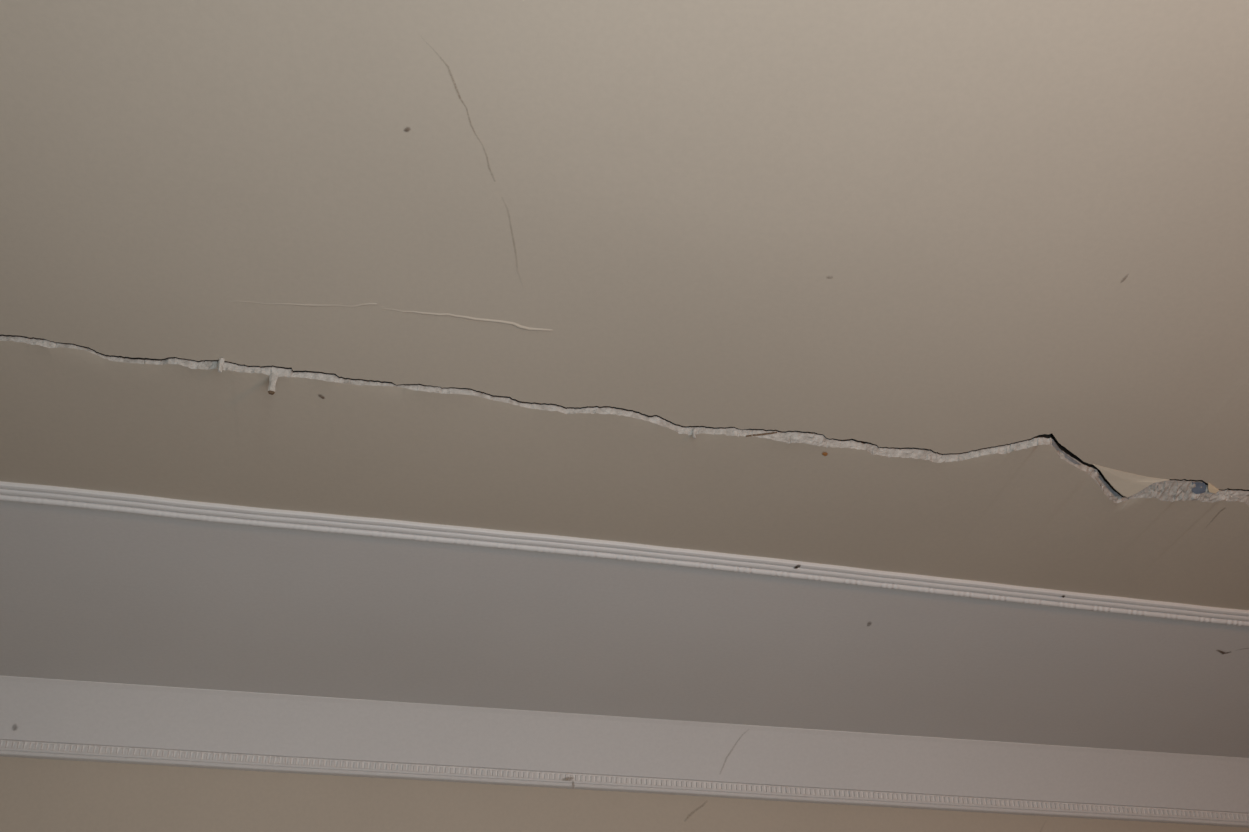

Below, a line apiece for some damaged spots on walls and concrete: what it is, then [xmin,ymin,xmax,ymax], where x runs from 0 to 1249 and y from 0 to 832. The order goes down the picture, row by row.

crack [0,334,1249,505]
peeling [1093,464,1168,497]